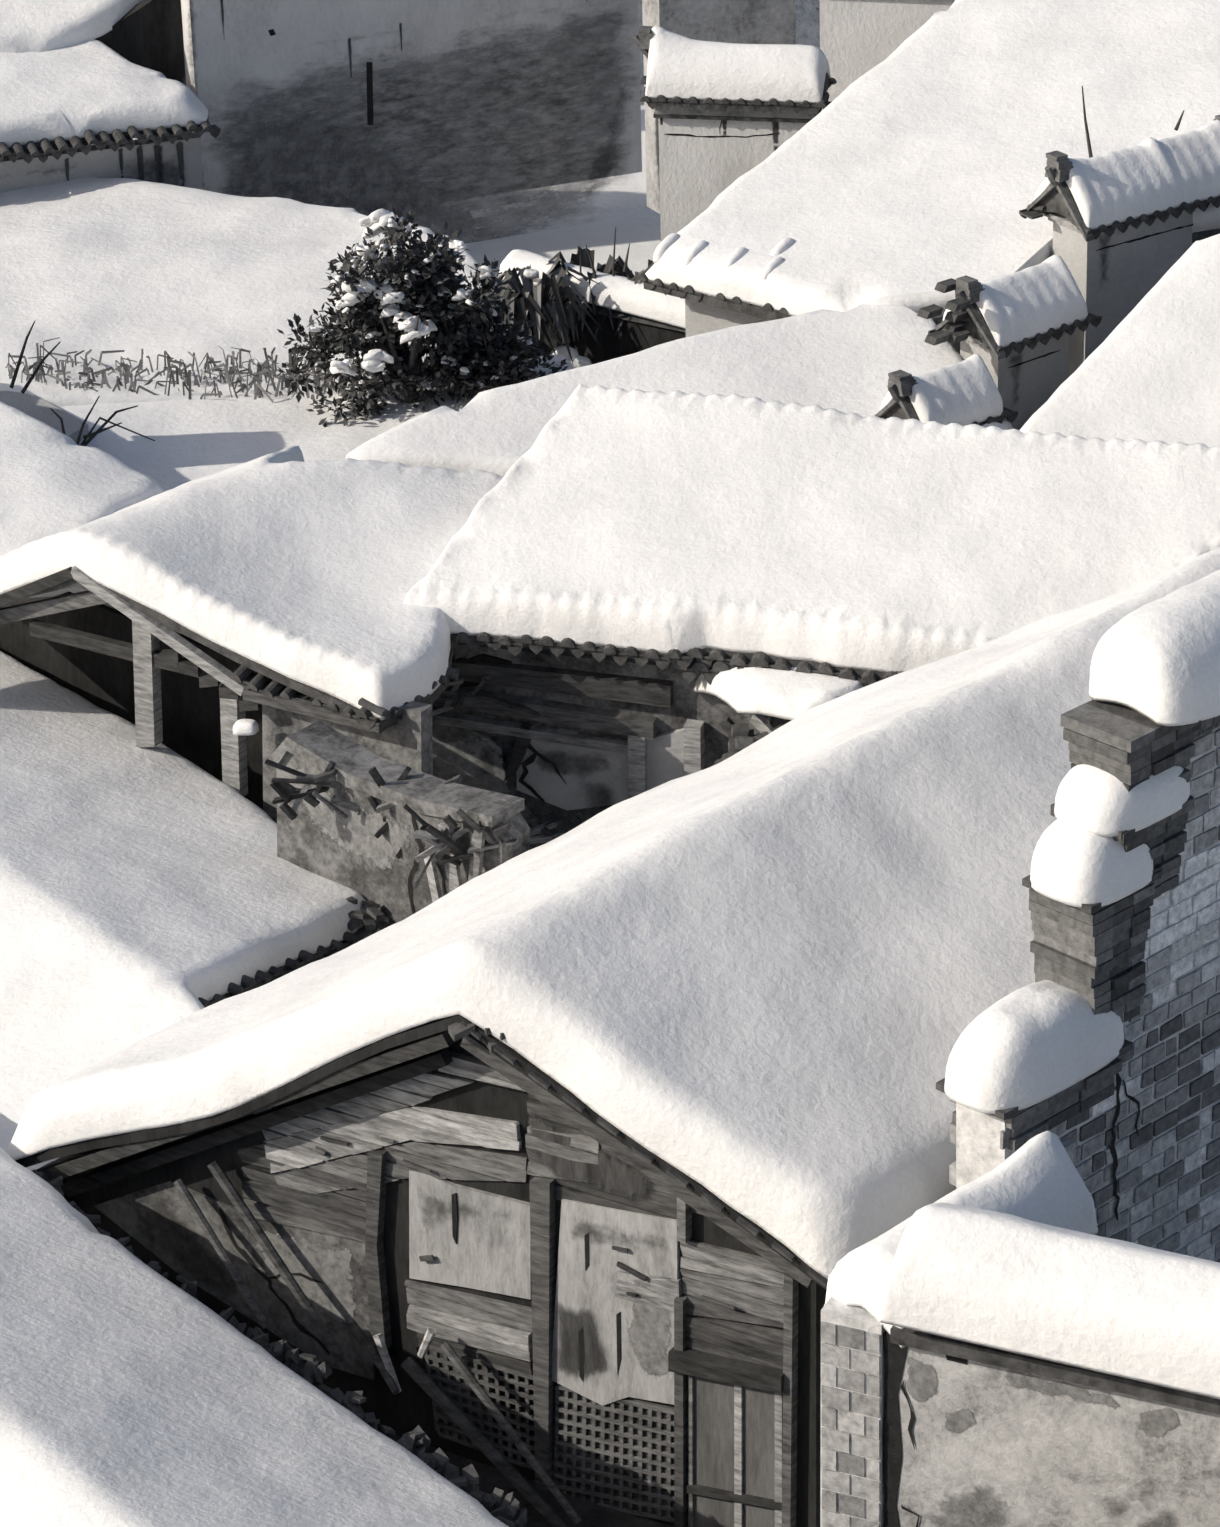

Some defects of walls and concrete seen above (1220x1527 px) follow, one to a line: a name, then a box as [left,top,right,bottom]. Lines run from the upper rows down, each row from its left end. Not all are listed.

water stain [655,118,663,189]
crack [1109,1073,1140,1220]
crack [219,1208,330,1355]
crack [882,1332,920,1527]
water stain [931,1489,1003,1527]